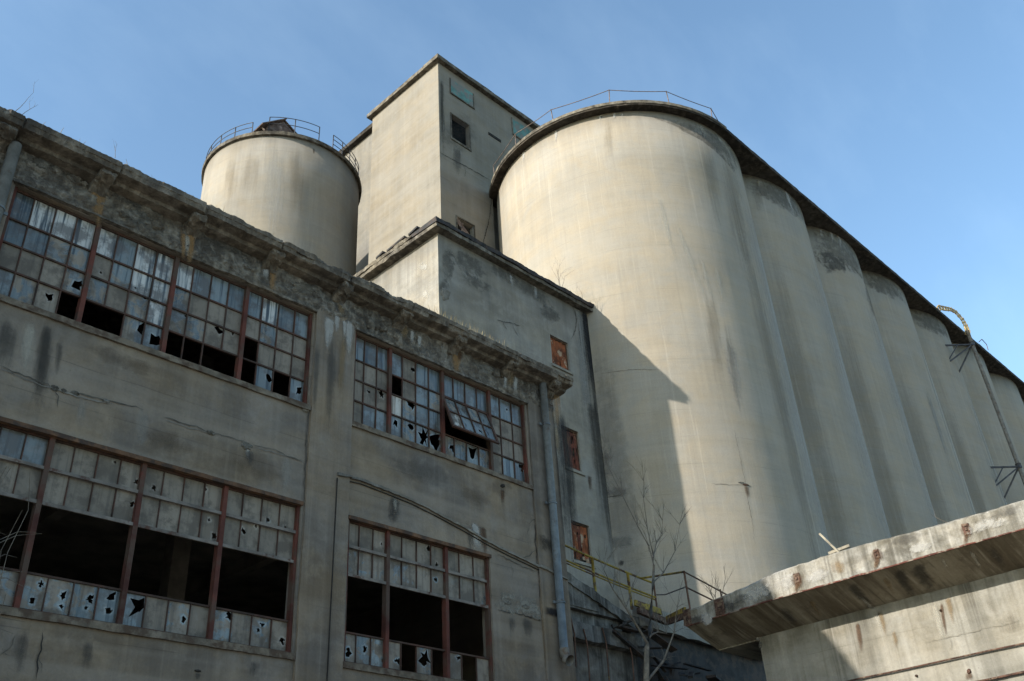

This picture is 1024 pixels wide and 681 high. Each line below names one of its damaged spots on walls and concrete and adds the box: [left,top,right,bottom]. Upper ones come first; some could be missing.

spalling [440,286,451,301]
damp [39,329,50,384]
crack [0,366,141,409]
crack [165,414,309,499]